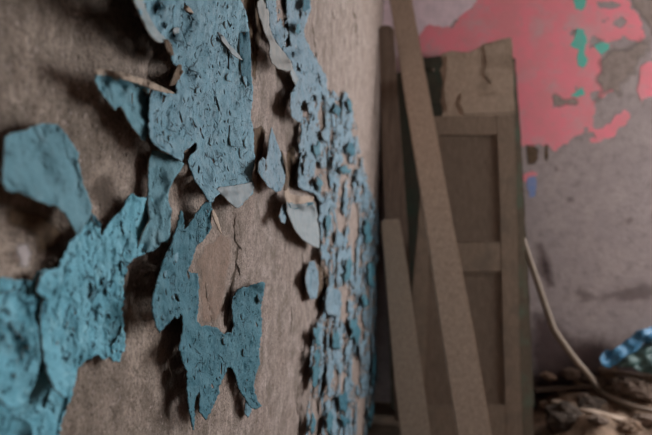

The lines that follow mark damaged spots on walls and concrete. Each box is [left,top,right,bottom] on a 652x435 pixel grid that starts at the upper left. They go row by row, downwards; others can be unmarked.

peeling [419,0,652,165]
peeling [0,0,379,435]
crack [226,216,242,324]